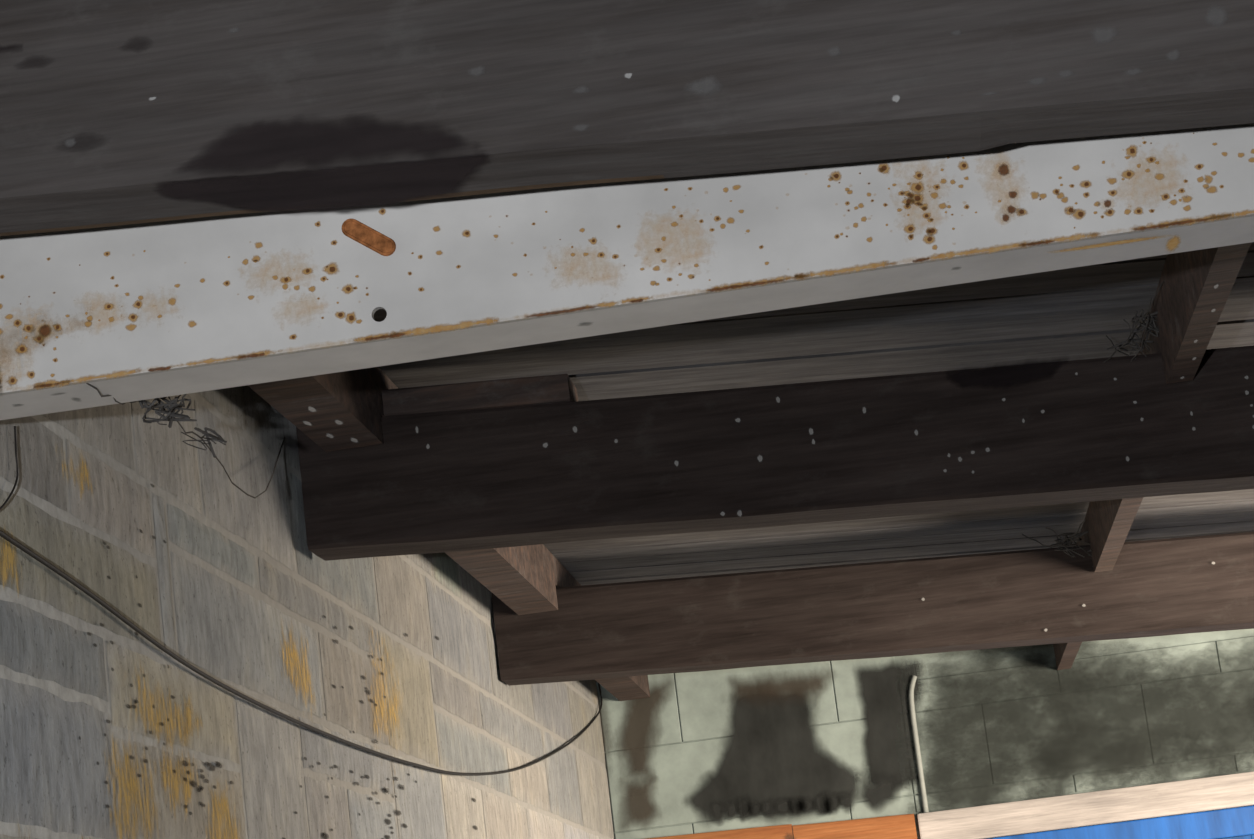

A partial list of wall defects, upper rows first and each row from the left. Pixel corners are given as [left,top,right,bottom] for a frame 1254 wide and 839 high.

rust [0,296,170,389]
rust [85,276,143,330]
rust [273,263,337,300]
damp [159,120,486,211]
rust [331,219,396,256]
rust [322,275,497,342]
rust [527,206,698,317]
rust [707,246,893,291]
rust [827,141,1254,262]
damp [304,757,417,839]
damp [621,686,666,822]
damp [690,653,1254,823]